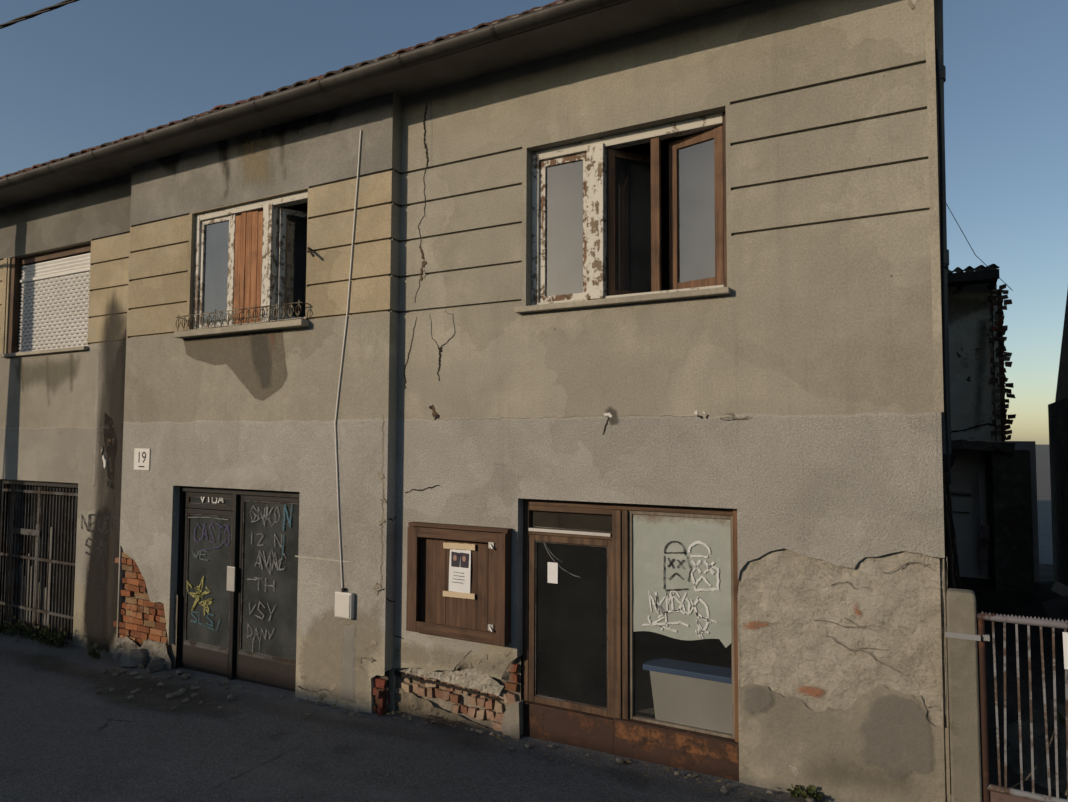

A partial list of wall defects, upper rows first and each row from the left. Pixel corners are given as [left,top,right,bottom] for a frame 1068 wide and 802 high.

crack [404,103,455,389]
leakage [183,330,287,400]
leakage [85,301,127,651]
flaking render [113,549,178,669]
flaking render [372,635,523,739]
rust [615,721,738,763]
flaking render [737,548,950,802]